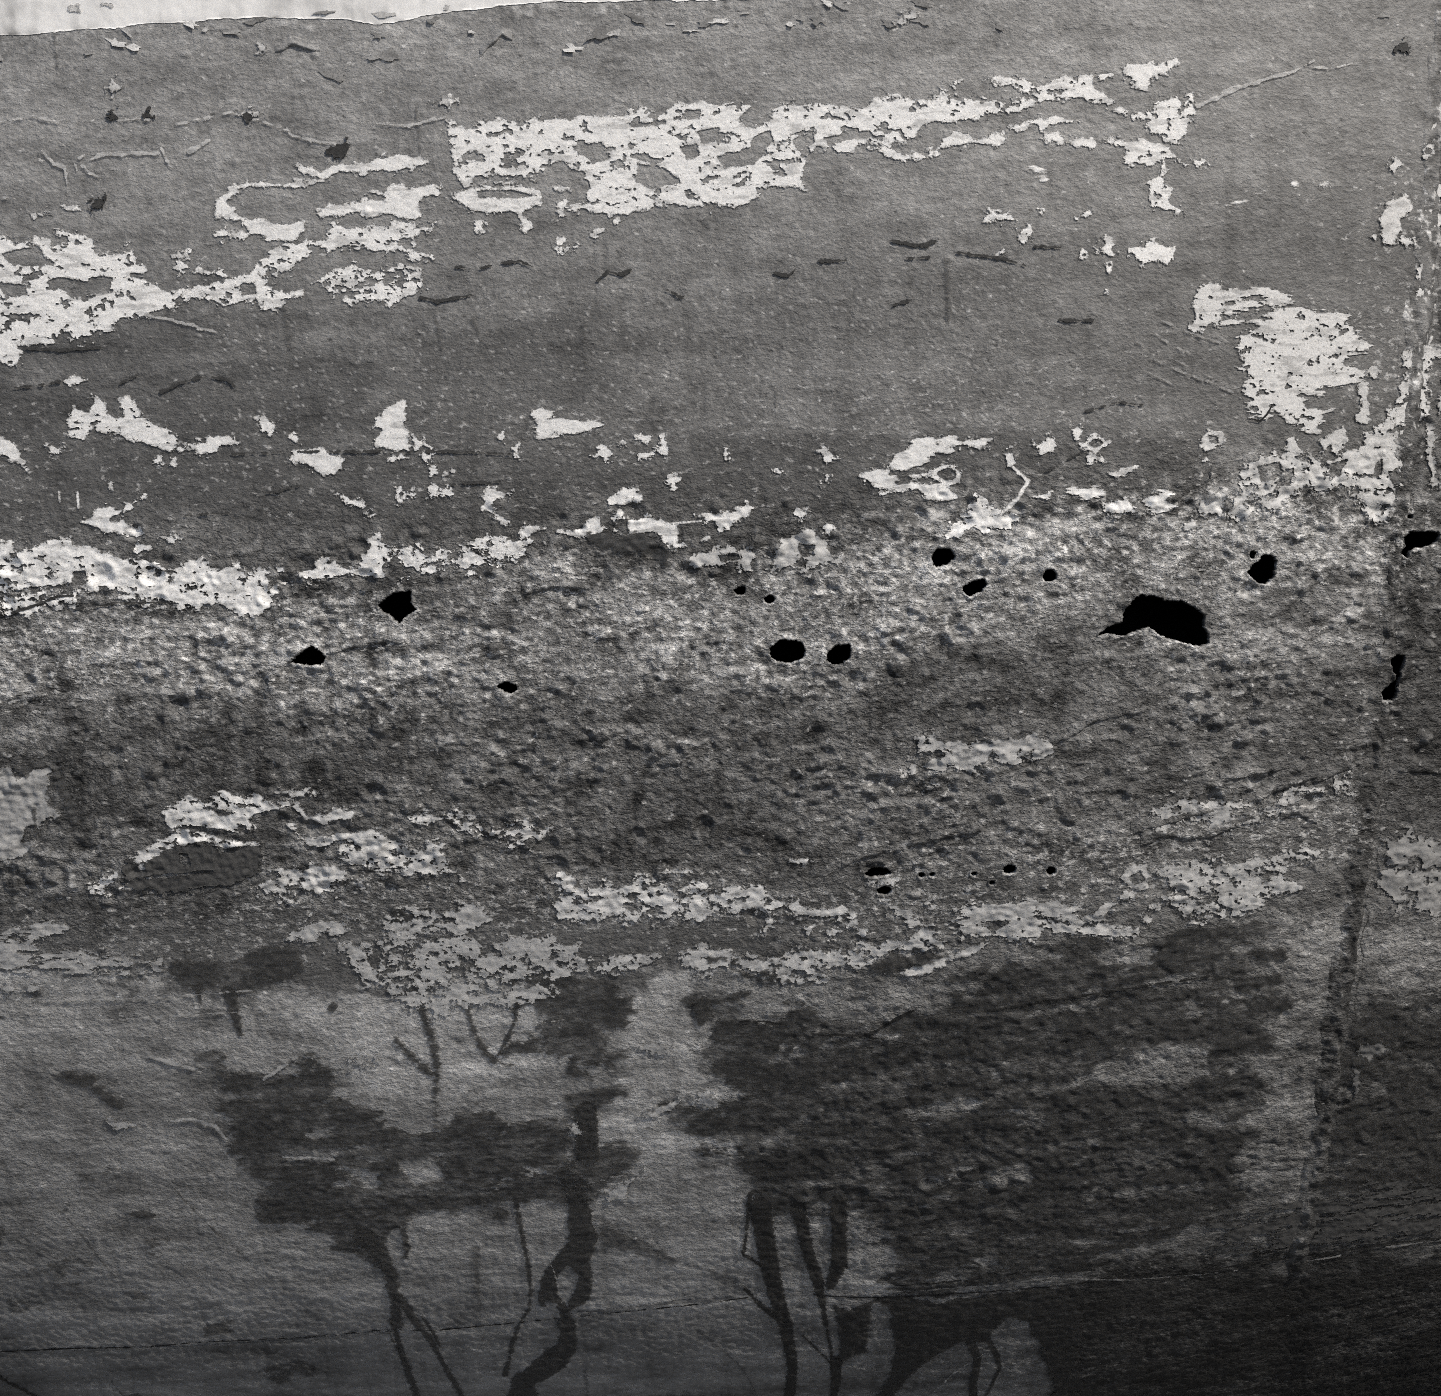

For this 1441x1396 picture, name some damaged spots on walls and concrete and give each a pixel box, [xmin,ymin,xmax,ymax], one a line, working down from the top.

peeling [0,57,1214,367]
peeling [44,374,239,467]
peeling [372,399,457,506]
peeling [858,281,1441,567]
peeling [0,482,844,631]
spalling [1099,594,1207,646]
crack [1378,570,1395,655]
leakage [707,954,791,985]
leakage [871,951,945,974]
leakage [946,964,993,983]
crack [813,1237,1441,1298]
crack [0,1297,748,1352]